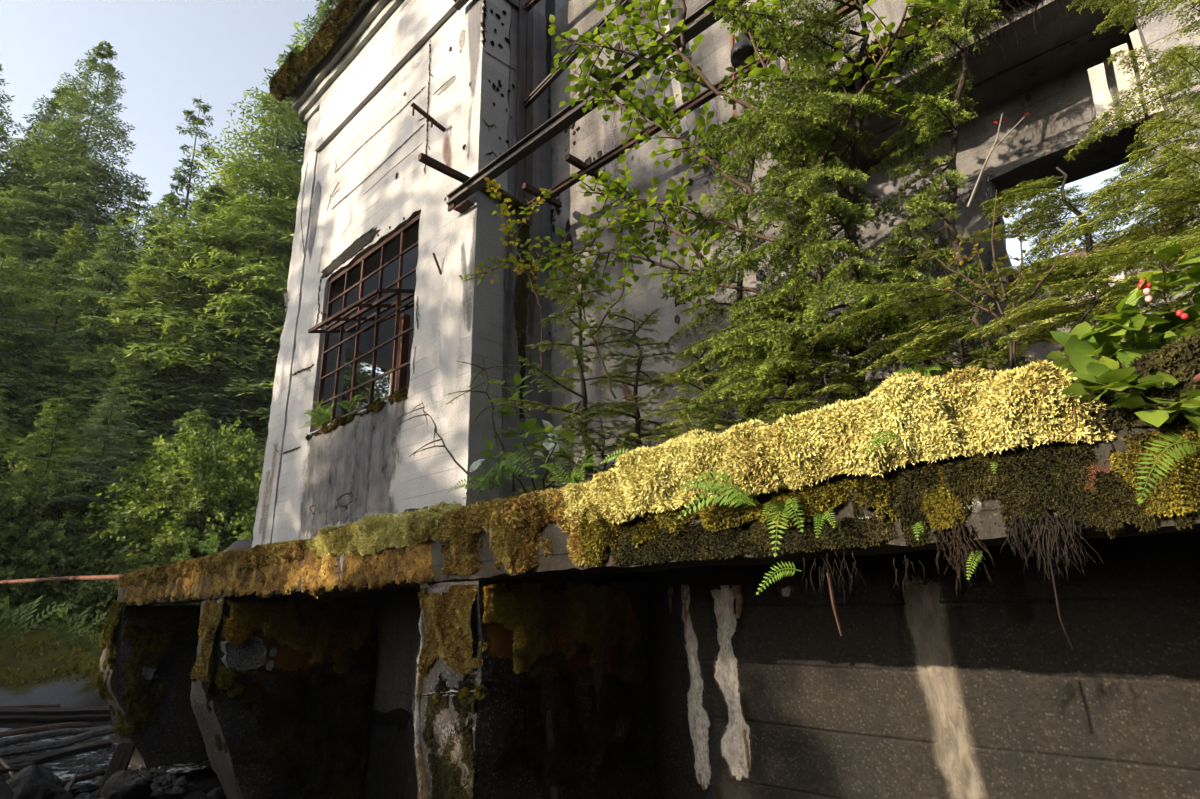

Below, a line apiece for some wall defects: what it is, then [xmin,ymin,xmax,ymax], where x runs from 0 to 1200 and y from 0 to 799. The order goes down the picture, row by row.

leakage [299,399,405,536]
spalling [220,635,277,674]
leakage [668,584,751,790]